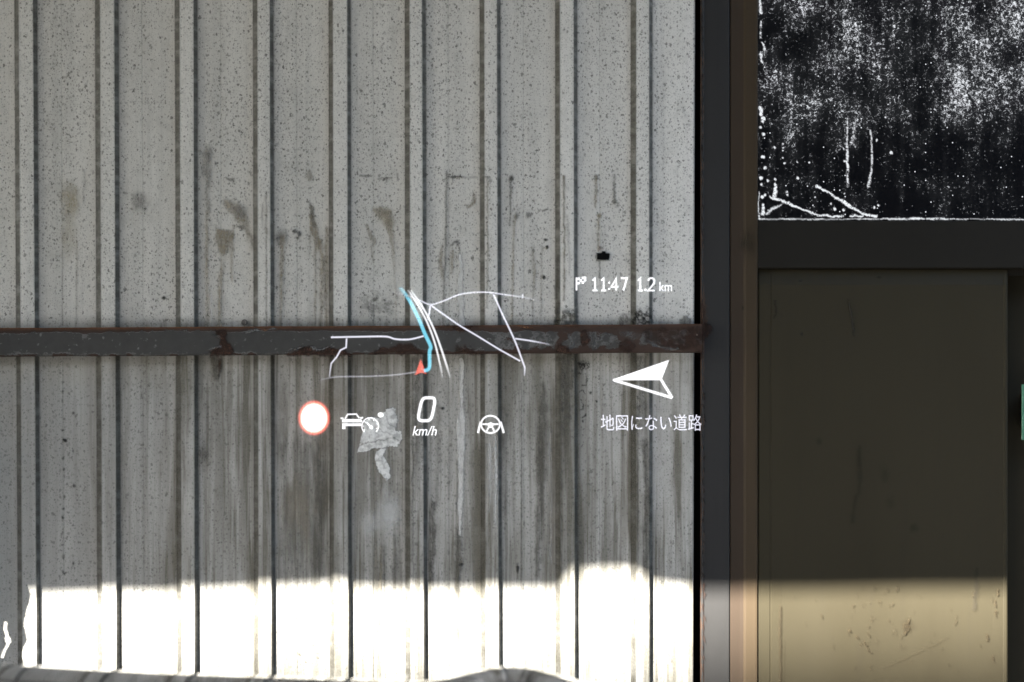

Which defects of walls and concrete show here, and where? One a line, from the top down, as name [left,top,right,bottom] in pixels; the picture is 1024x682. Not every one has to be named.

damp [206,201,252,274]
damp [280,206,328,326]
rust [209,330,234,378]
rust [285,346,351,357]
rust [374,343,422,356]
rust [455,346,483,355]
damp [412,358,422,435]
damp [455,358,465,626]
damp [535,385,546,567]